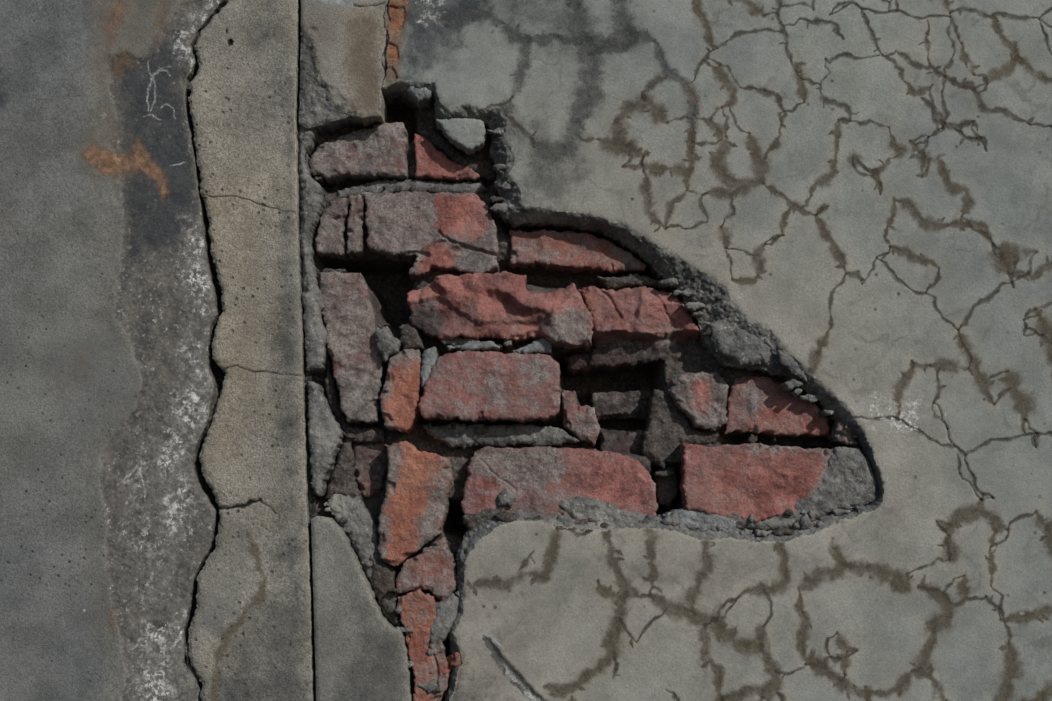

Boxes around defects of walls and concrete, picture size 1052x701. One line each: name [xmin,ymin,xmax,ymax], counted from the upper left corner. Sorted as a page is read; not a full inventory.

rust [84,141,168,199]
peeling [99,0,228,701]
crack [185,359,299,701]
crack [204,194,295,334]
spalling [298,35,884,701]
crack [435,0,1052,701]